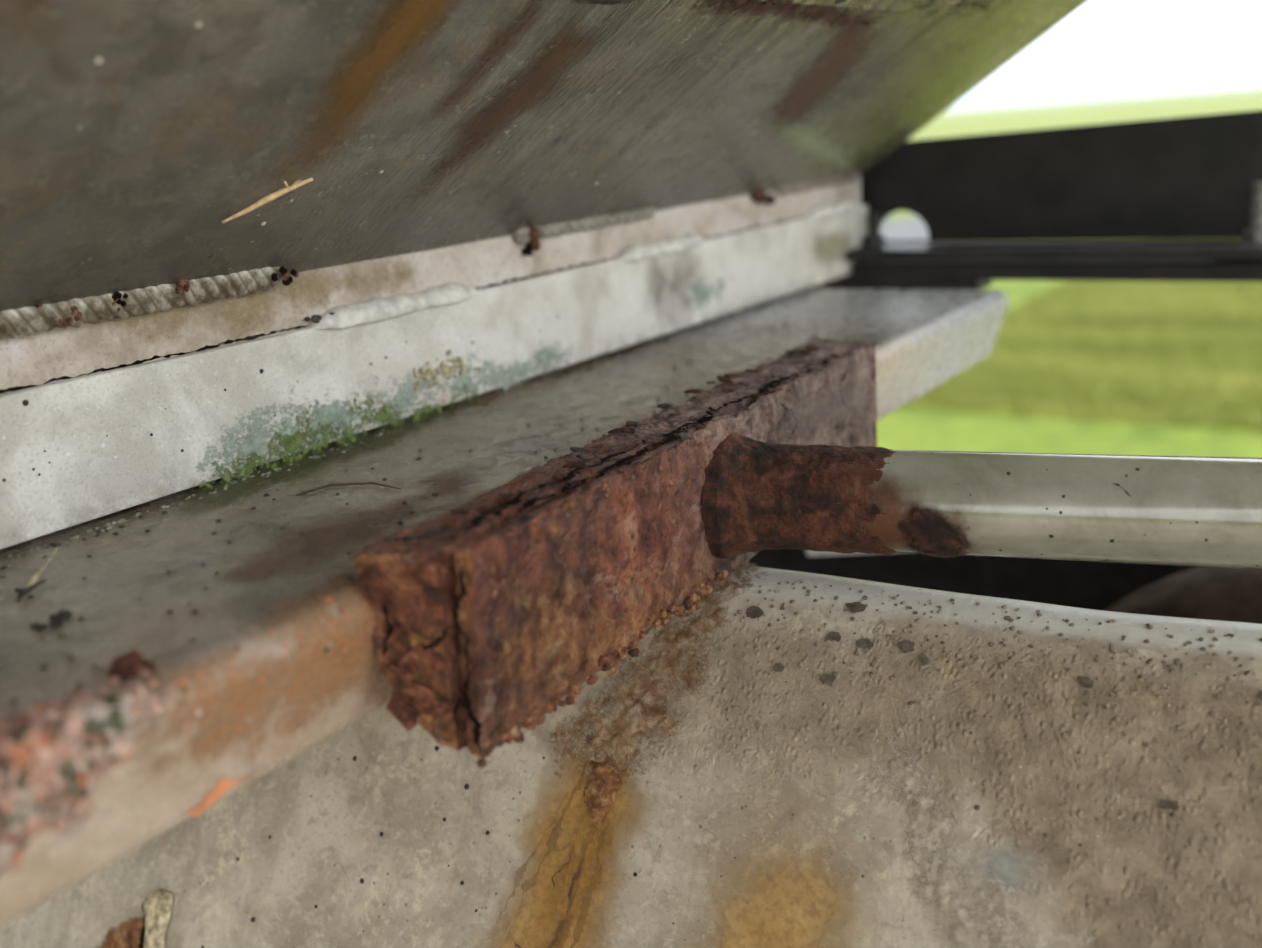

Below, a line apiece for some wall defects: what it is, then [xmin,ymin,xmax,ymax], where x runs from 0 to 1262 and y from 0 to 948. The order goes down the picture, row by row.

corrosion [139,344,877,948]
crack [514,848,582,948]